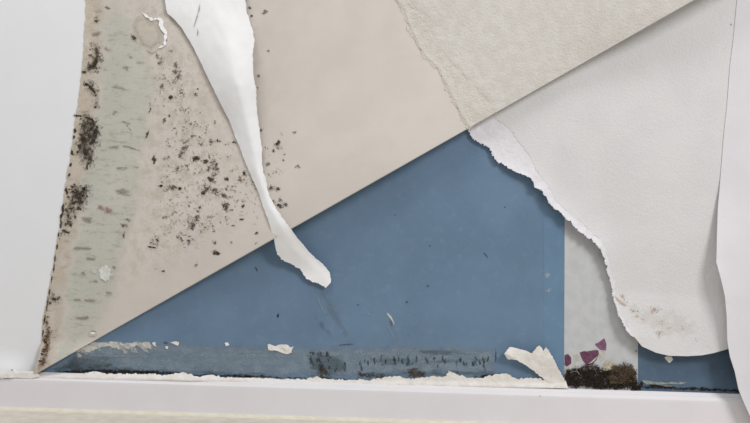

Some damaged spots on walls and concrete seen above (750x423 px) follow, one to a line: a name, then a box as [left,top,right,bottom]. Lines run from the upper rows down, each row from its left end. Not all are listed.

damp [37,32,108,367]
damp [148,54,256,251]
peeling [34,0,694,373]
damp [56,343,500,380]
damp [564,361,739,393]